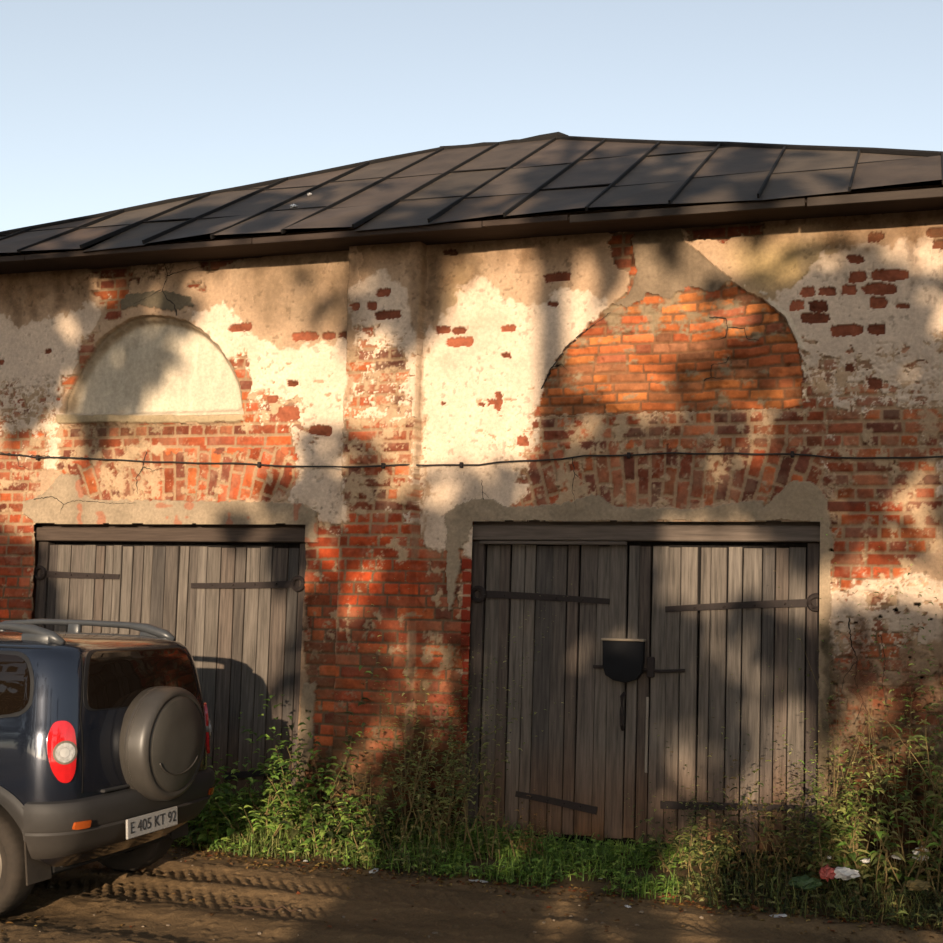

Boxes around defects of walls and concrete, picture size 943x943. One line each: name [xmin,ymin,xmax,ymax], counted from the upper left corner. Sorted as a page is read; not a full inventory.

flaking render [607,232,634,271]
flaking render [682,222,765,243]
flaking render [868,230,885,243]
flaking render [926,226,943,249]
flaking render [86,266,143,321]
crack [134,263,200,316]
flaking render [228,322,252,332]
flaking render [479,391,503,416]
crack [34,452,164,513]
flaking render [0,332,332,631]
flaking render [293,287,474,835]
flaking render [505,253,943,870]